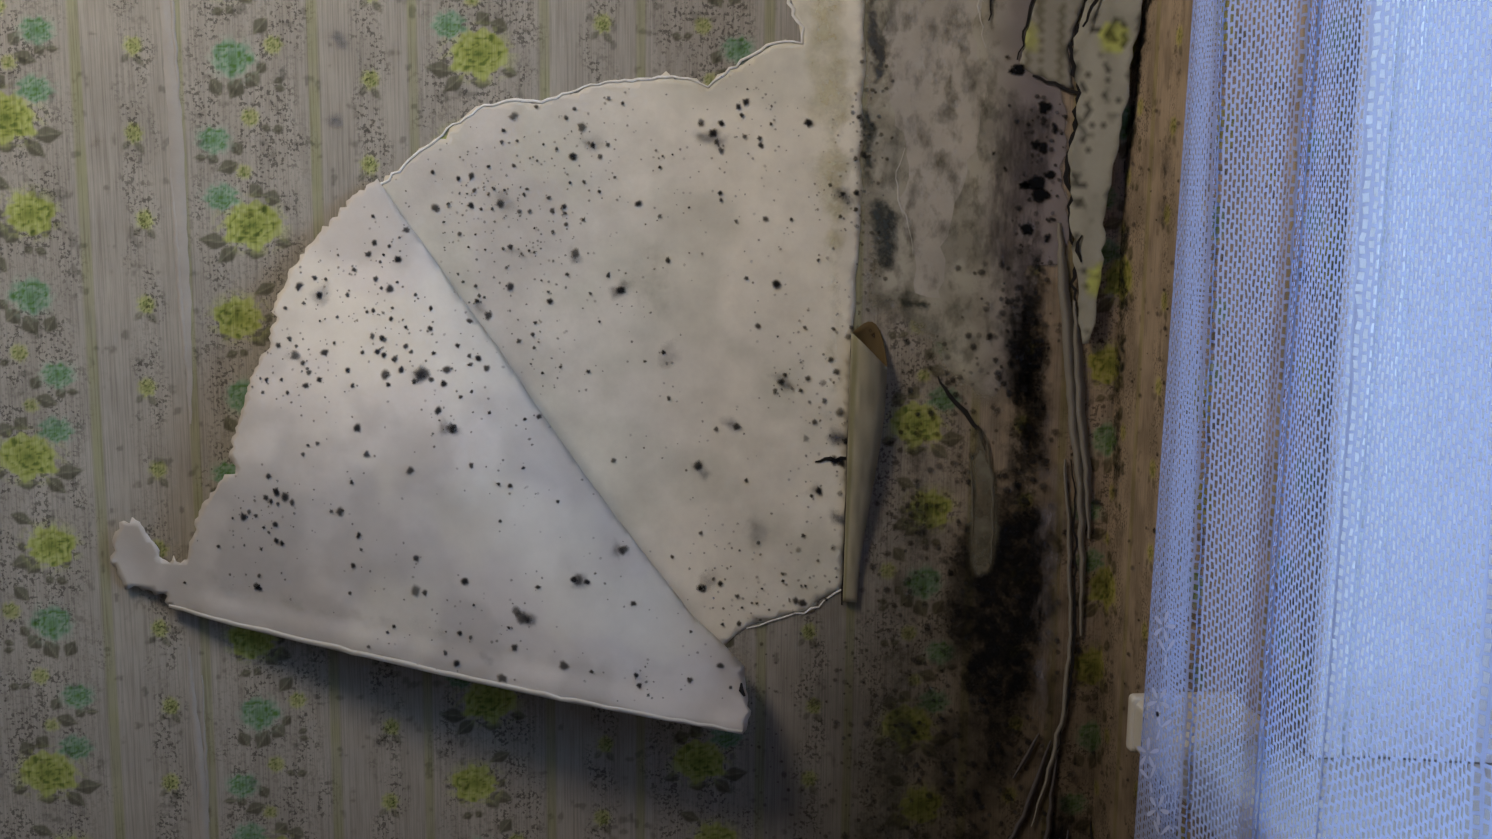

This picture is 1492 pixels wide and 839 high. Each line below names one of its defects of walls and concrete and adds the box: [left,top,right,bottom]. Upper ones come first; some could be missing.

mould [217,474,315,551]
mould [251,336,335,416]
leakage [283,107,616,414]
mould [507,603,534,651]
peeling [110,0,1143,734]
leakage [687,577,770,626]
leakage [698,88,787,173]
mould [759,353,848,465]
mould [828,0,896,280]
leakage [834,95,1082,839]
crack [988,0,1099,315]
crack [1057,459,1078,750]